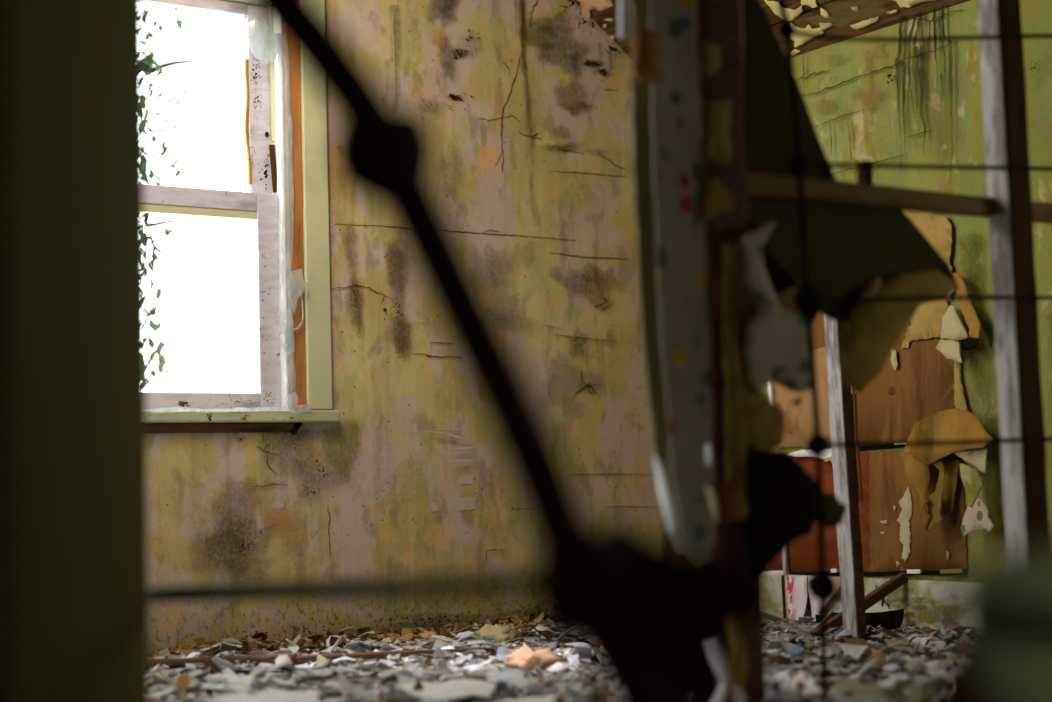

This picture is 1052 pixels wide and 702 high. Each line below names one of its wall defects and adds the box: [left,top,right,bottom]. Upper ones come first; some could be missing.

peeling [559,0,620,59]
leakage [582,42,613,81]
peeling [634,28,666,84]
peeling [764,0,833,56]
peeling [850,0,935,30]
leakage [883,5,953,133]
crack [478,52,625,177]
crack [457,230,623,260]